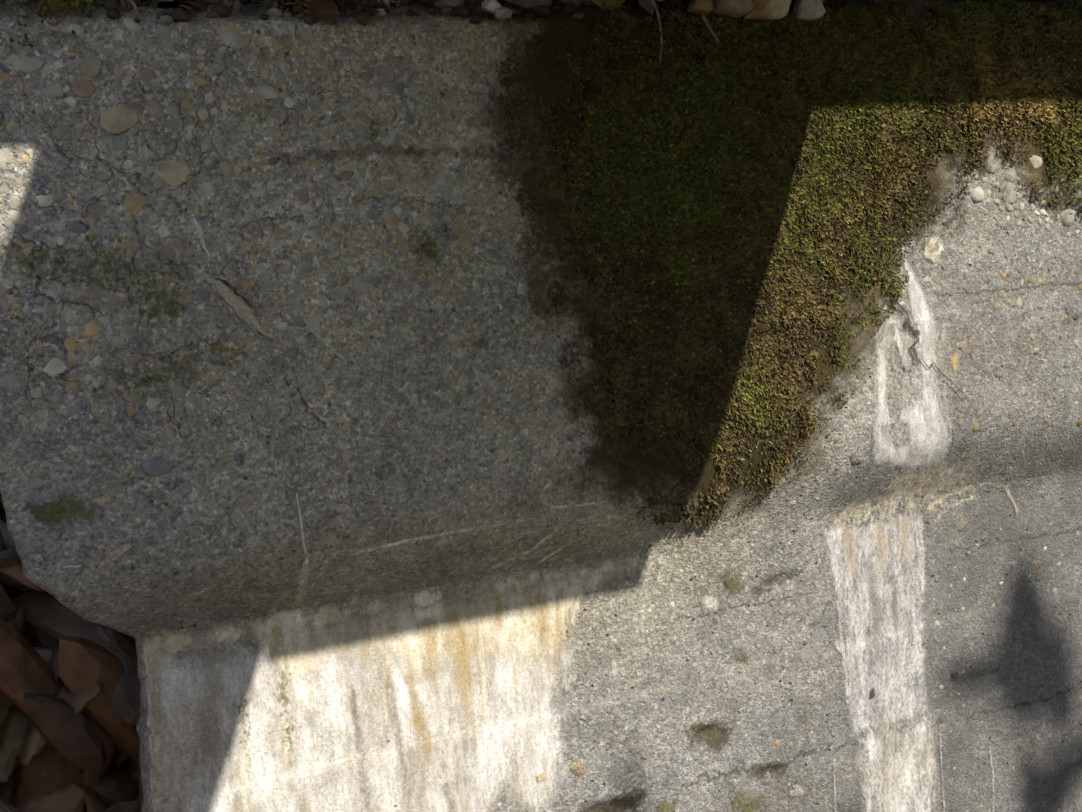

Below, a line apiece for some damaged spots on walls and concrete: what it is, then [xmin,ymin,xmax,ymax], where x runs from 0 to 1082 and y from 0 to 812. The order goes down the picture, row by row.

damp [875,245,947,504]
crack [884,299,968,398]
damp [924,235,943,262]
damp [142,558,638,812]
damp [828,483,1009,812]